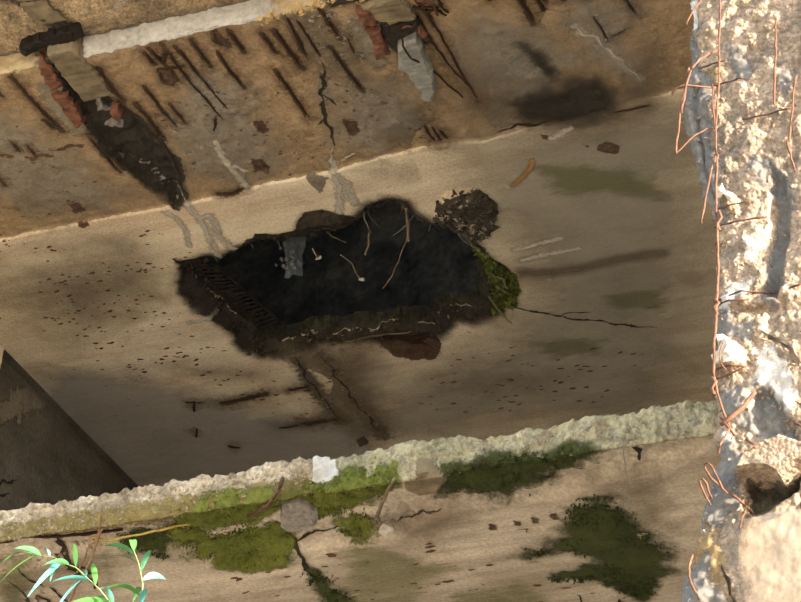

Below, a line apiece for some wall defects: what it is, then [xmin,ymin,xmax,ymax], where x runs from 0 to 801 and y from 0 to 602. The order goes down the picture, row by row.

damp [570,23,647,83]
spalling [0,65,174,238]
crack [317,62,337,146]
spalling [83,0,728,224]
spalling [174,198,500,360]
crack [516,307,657,328]
spalling [713,309,755,347]
spalling [333,382,798,496]
corrosion [719,390,757,427]
spalling [0,457,316,545]
spalling [701,441,744,530]